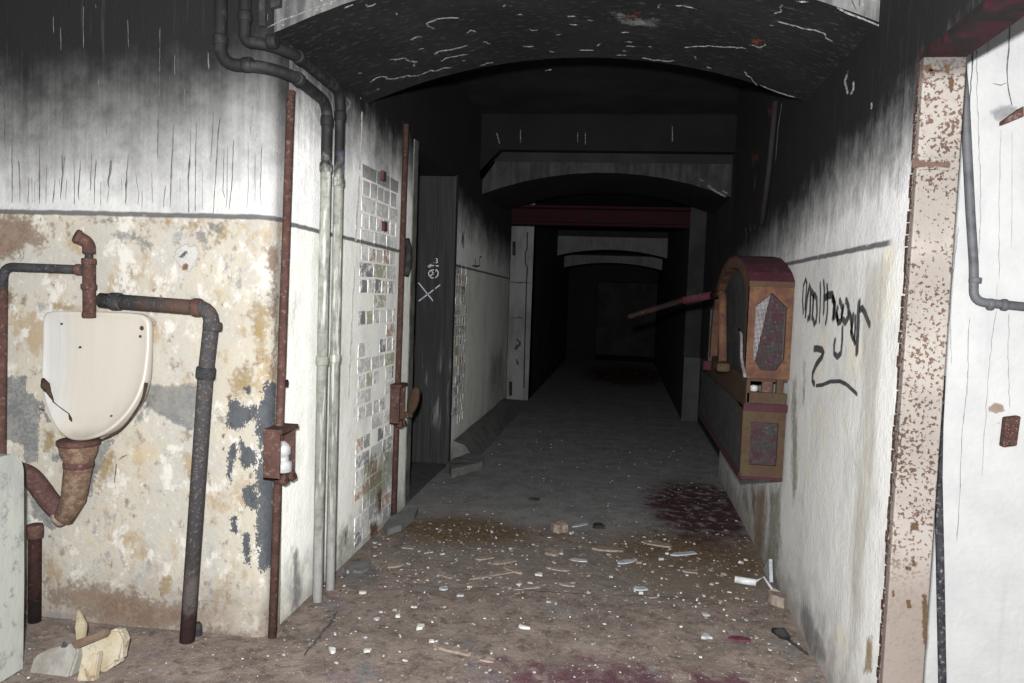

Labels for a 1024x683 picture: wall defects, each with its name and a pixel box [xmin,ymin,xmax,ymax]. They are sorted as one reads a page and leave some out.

rust [924,64,954,93]
water stain [3,83,174,206]
water stain [188,88,234,225]
rust [911,159,950,168]
water stain [254,305,266,360]
peeling [225,380,277,576]
water stain [50,581,181,629]